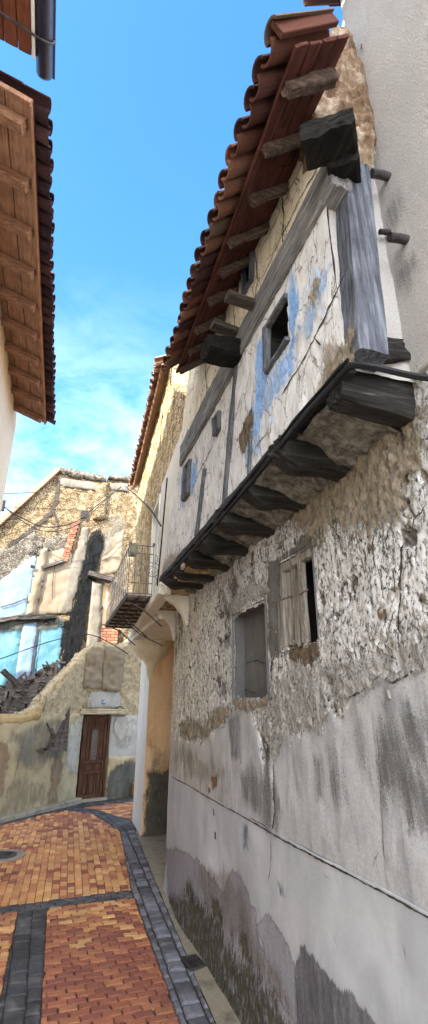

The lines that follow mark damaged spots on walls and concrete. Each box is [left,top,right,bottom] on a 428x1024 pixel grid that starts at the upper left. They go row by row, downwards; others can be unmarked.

peeling [236,265,332,466]
crack [282,265,349,394]
flaking render [377,586,403,620]
peeling [48,696,99,803]
leakage [106,759,169,837]
crack [173,632,428,918]
flaking render [178,618,428,769]
leakage [358,697,428,835]
leakage [240,931,251,964]